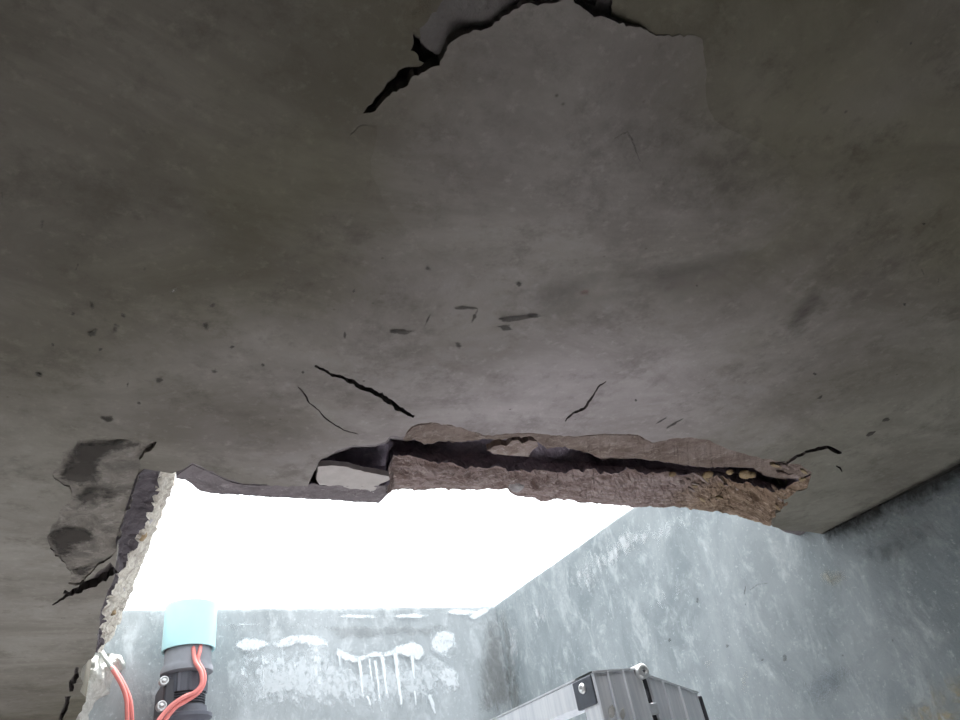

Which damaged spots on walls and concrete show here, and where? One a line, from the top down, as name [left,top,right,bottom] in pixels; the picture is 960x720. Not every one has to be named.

crack [298,387,357,434]
crack [315,365,415,418]
crack [566,381,606,420]
crack [775,446,842,472]
spalling [47,418,811,653]
crack [52,555,119,605]
water stain [236,631,460,714]